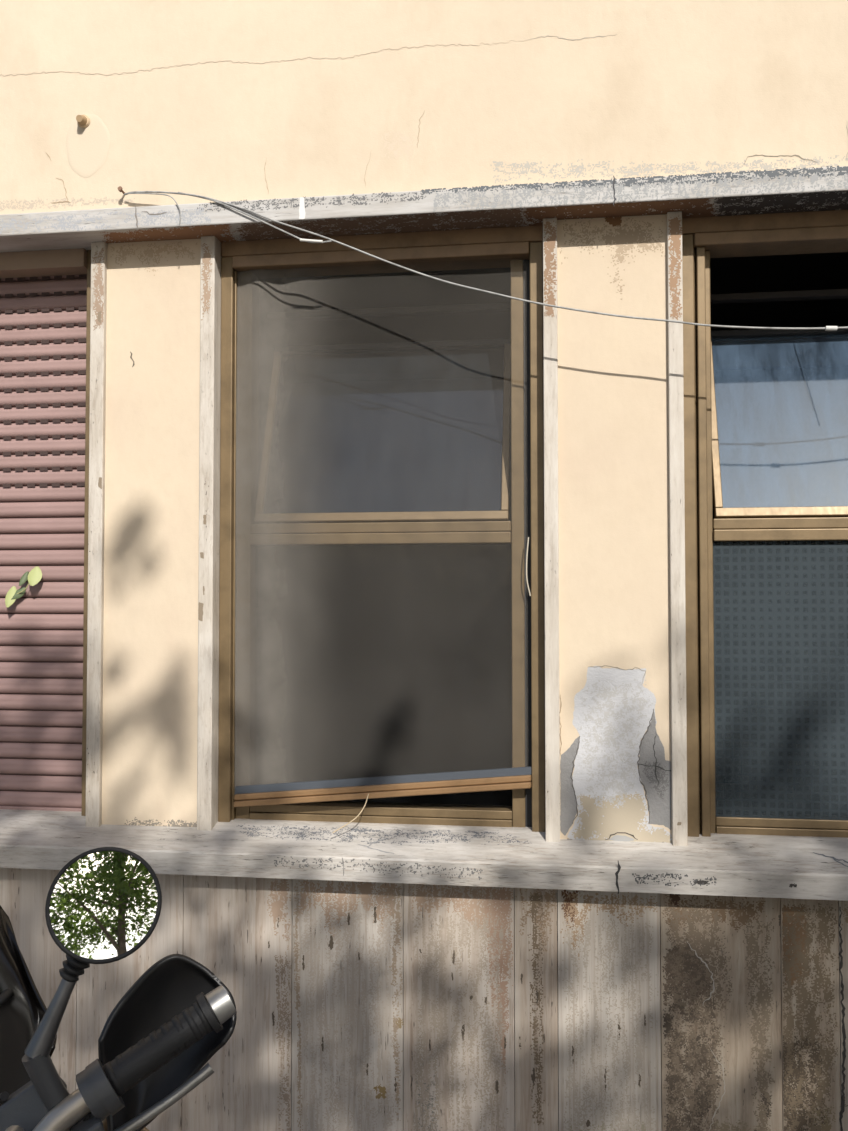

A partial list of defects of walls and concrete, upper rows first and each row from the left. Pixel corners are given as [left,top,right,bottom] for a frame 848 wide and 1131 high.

leakage [238,825,528,845]
peeling [560,666,681,842]
leakage [632,873,717,887]
crack [813,852,848,867]
leakage [528,893,546,1125]
leakage [559,901,839,1131]
crack [839,907,848,1131]